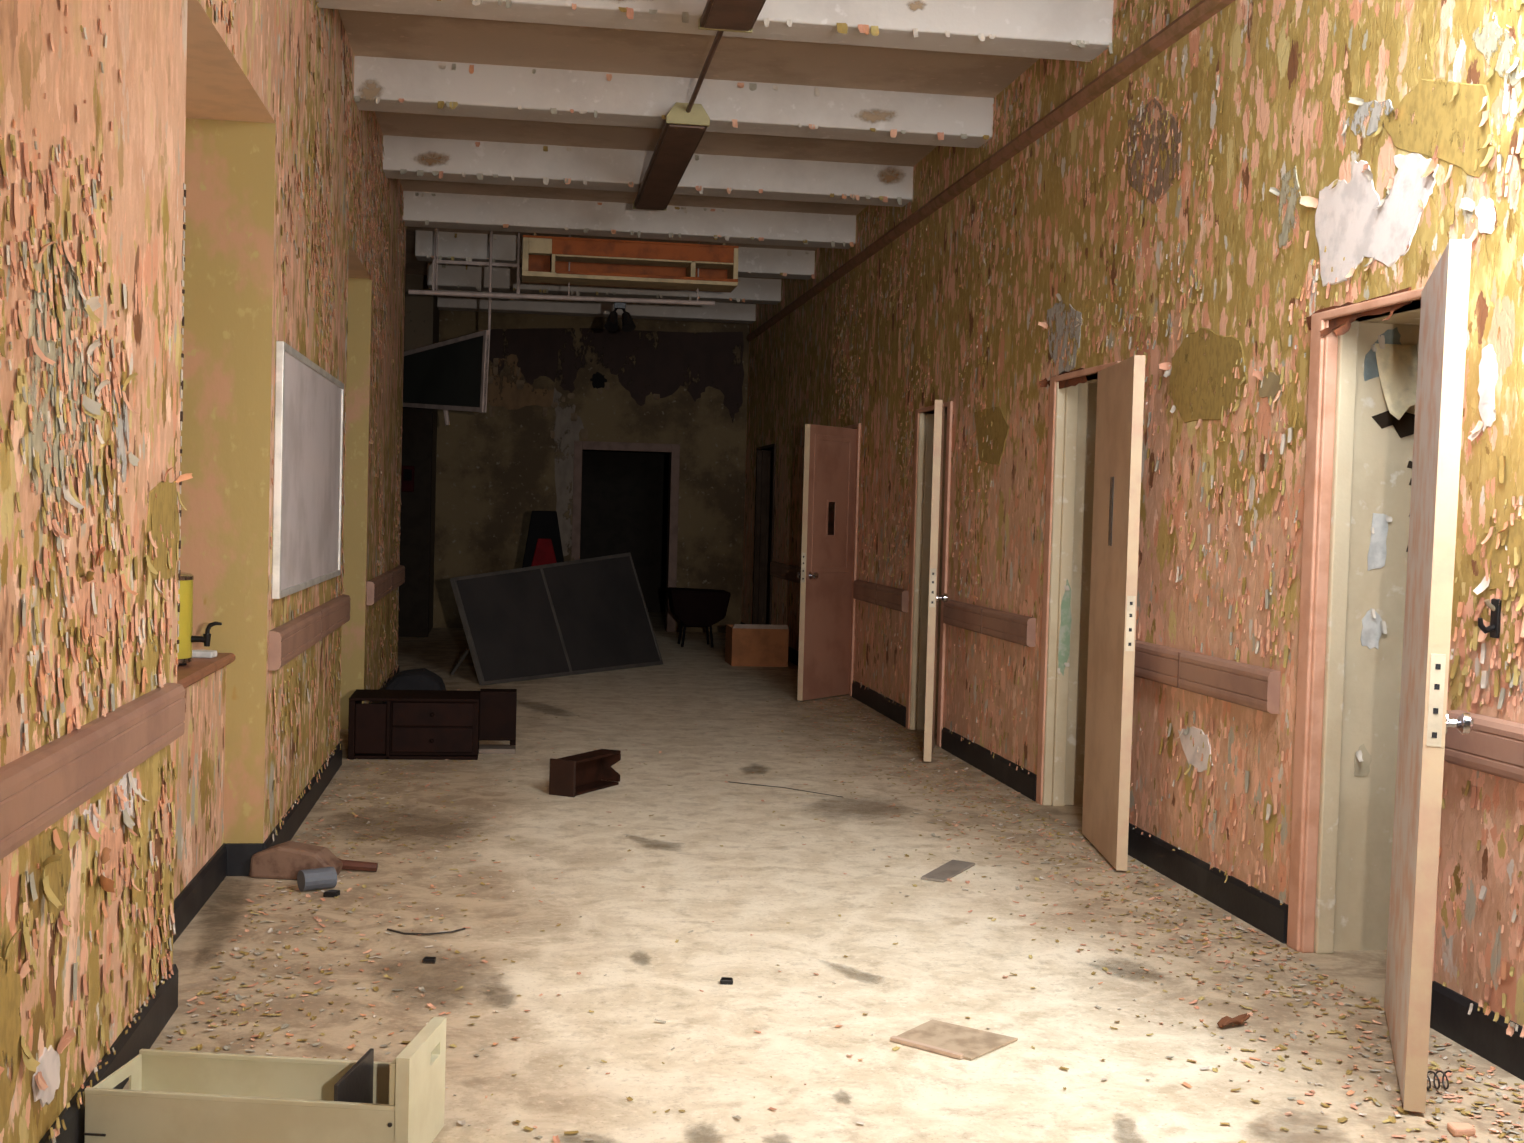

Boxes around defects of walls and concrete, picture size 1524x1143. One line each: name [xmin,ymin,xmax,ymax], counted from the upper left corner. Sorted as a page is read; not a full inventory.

peeling [207,0,236,54]
peeling [837,23,879,36]
damp [859,110,894,123]
peeling [279,0,443,598]
peeling [478,328,744,561]
peeling [830,159,936,591]
peeling [1035,0,1524,676]
peeling [1448,456,1524,714]
peeling [268,632,342,842]
peeling [1159,702,1283,905]
peeling [0,762,177,1143]
peeling [1468,871,1524,1037]